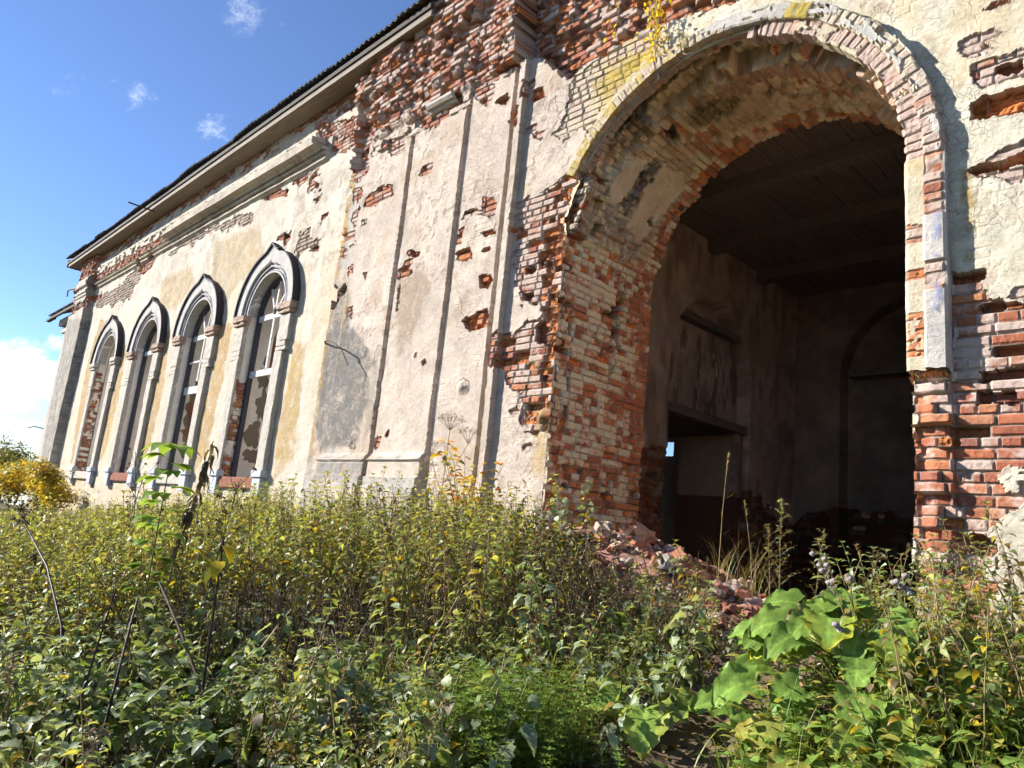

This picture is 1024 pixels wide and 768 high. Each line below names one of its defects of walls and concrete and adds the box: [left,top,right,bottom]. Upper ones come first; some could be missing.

spalling [955,23,1024,122]
spalling [86,0,739,320]
spalling [965,137,1024,191]
flaking render [455,169,589,452]
flaking render [76,372,103,471]
peeling [221,331,278,477]
flaking render [905,254,1024,627]